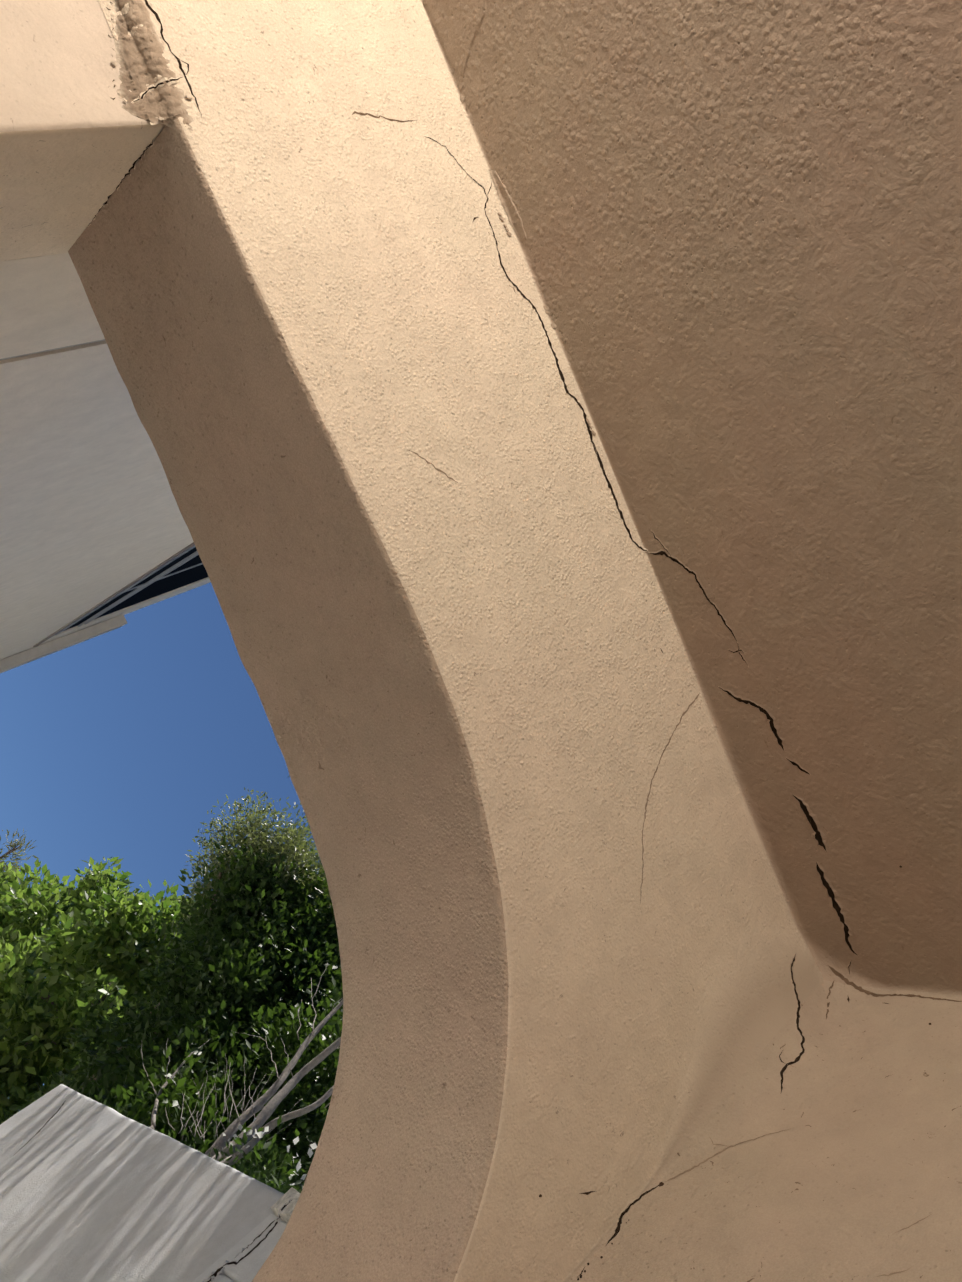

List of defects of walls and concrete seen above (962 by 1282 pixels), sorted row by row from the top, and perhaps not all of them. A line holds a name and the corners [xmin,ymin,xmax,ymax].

flaking render [106,0,193,131]
crack [352,111,962,1094]
crack [577,1129,789,1280]